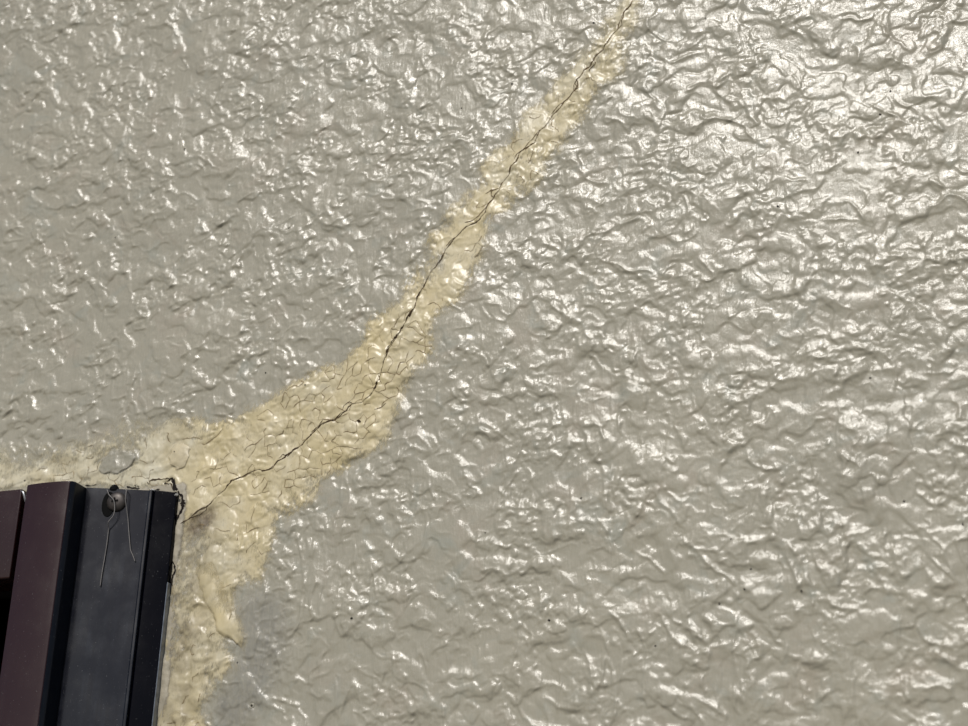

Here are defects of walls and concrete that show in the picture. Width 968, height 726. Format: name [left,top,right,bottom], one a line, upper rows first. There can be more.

crack [39,0,635,555]